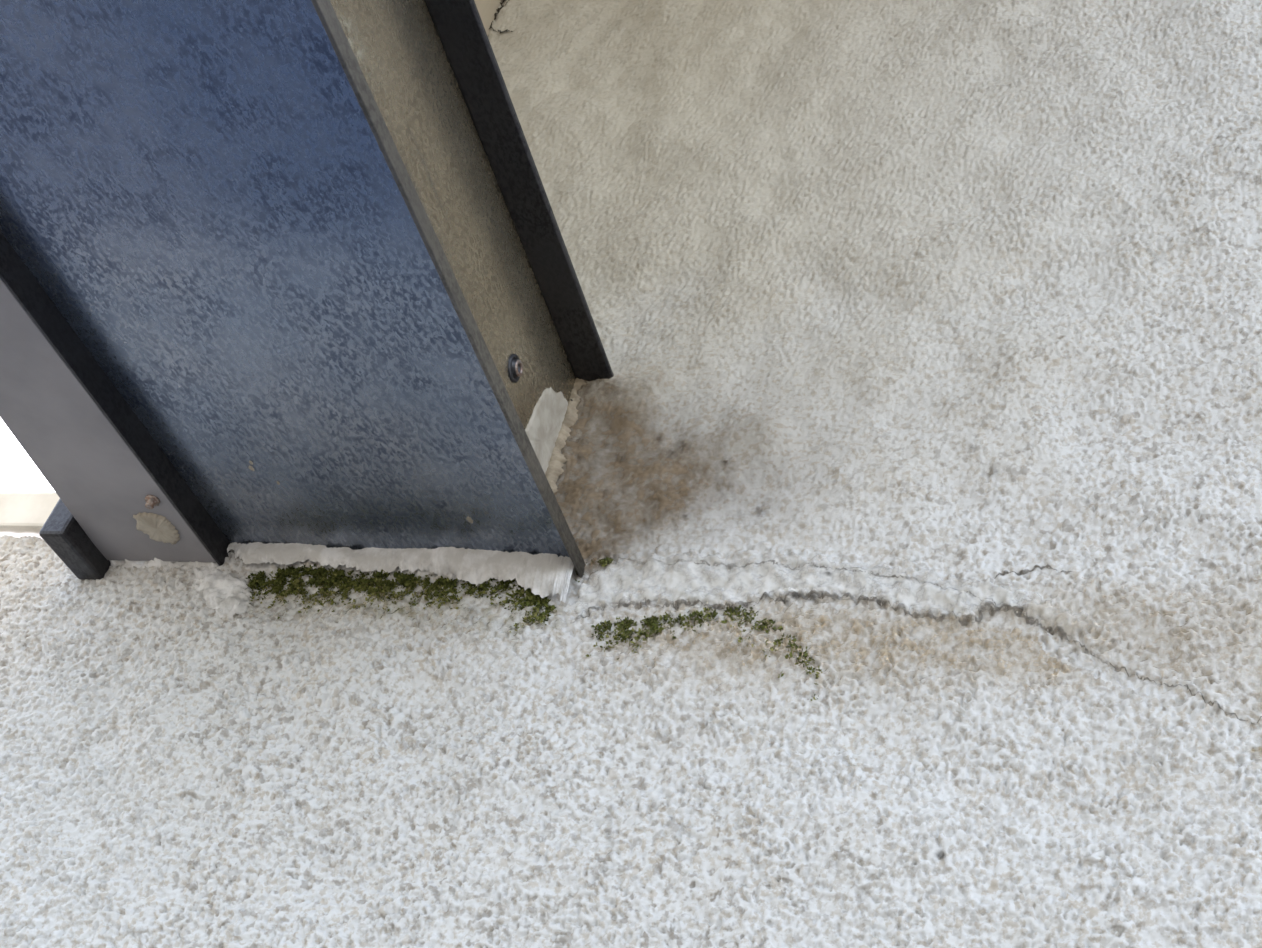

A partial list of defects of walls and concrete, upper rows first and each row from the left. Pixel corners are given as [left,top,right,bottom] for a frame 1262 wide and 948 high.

crack [489,0,513,33]
crack [611,558,1071,606]
crack [1072,640,1262,725]